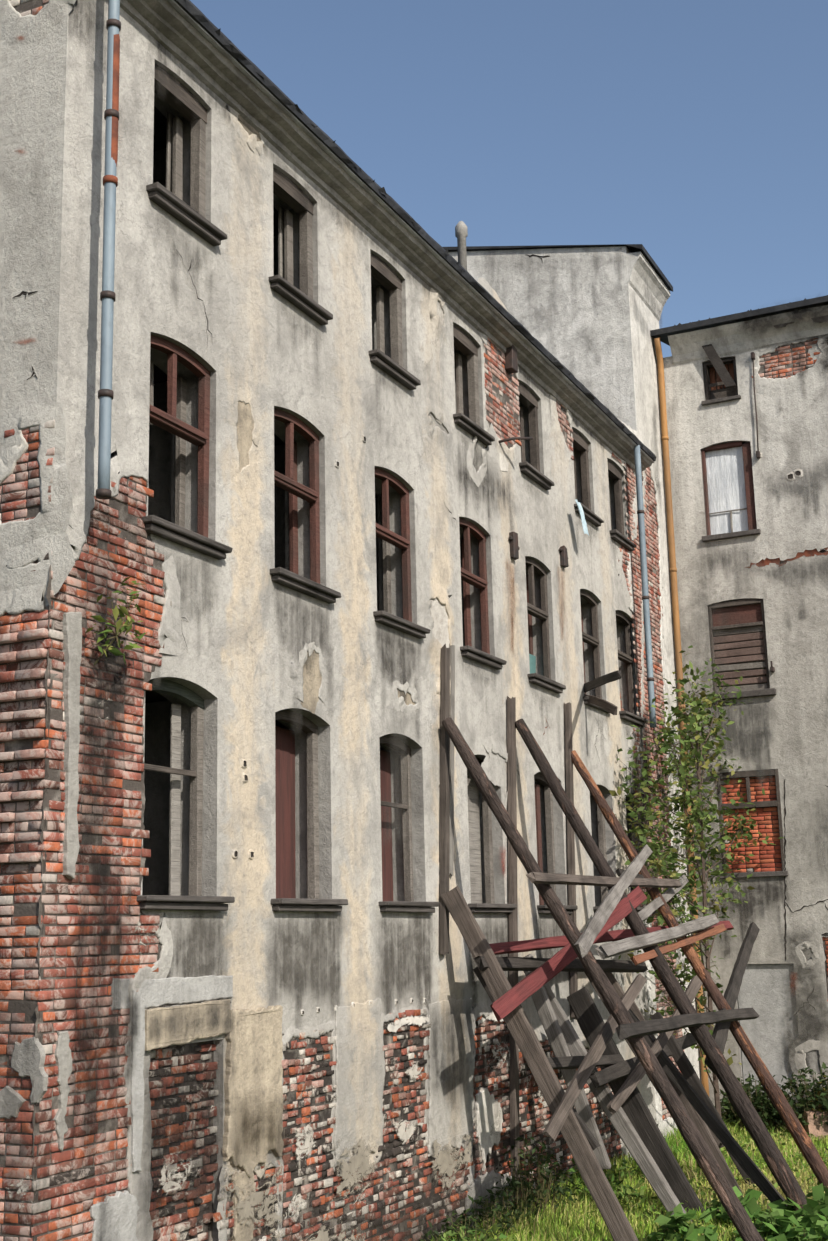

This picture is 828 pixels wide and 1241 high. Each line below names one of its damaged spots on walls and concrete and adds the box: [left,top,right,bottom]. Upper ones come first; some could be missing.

flaking render [0,0,76,46]
flaking render [477,278,507,310]
flaking render [742,305,828,397]
spalling [224,379,264,492]
flaking render [419,331,522,491]
flaking render [611,452,678,927]
flaking render [0,394,578,1241]
crack [783,779,828,961]
flaking render [646,939,689,1074]
flaking render [583,1082,625,1164]
flaking render [654,1087,678,1137]